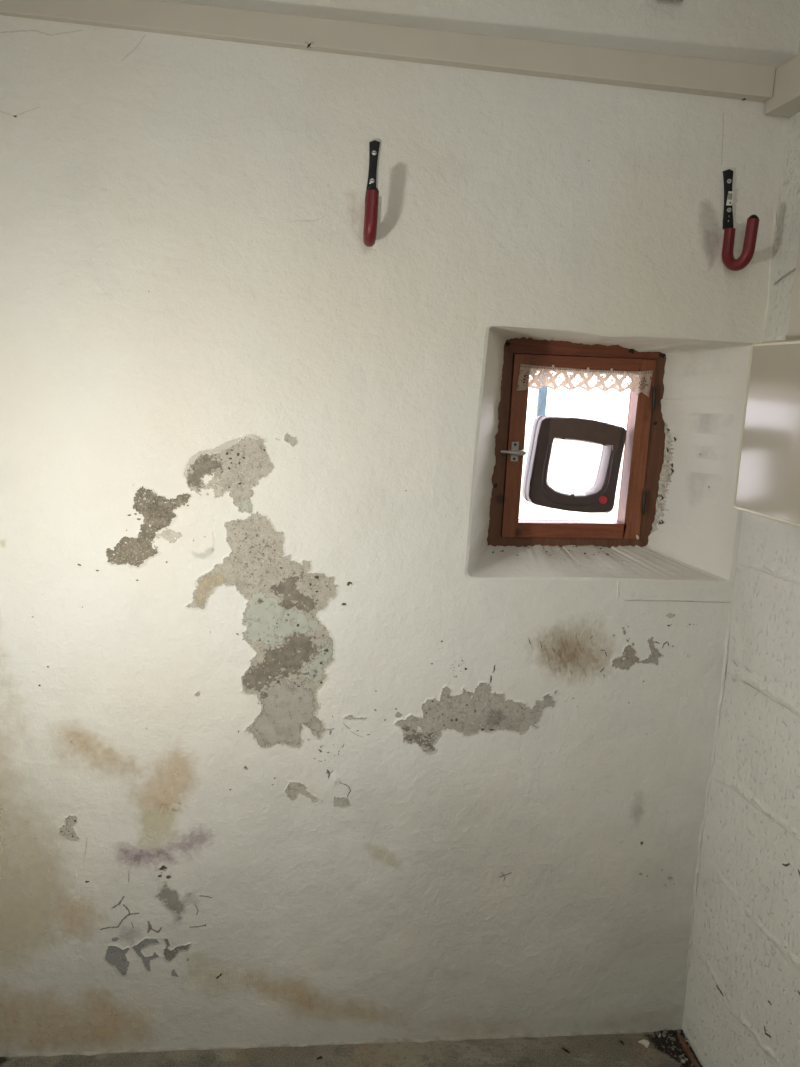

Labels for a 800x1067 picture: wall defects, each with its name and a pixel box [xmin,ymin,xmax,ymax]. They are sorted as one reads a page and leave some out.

spalling [104,431,368,778]
spalling [610,626,674,671]
spalling [393,660,558,755]
peeling [284,779,352,808]
crack [100,872,162,933]
damp [158,865,183,914]
peeling [101,936,192,984]